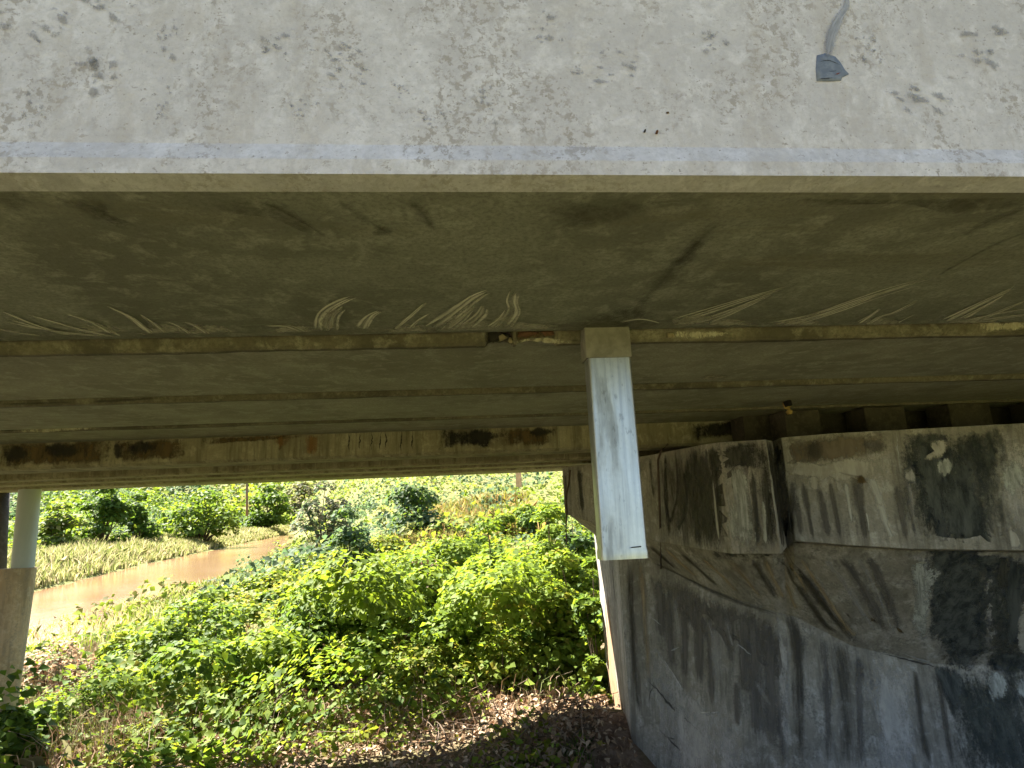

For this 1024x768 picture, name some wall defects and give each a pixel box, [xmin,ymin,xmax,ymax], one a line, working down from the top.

spalling [486,331,569,344]
water stain [650,421,915,549]
water stain [828,559,899,628]
water stain [995,557,1024,647]
water stain [604,548,864,761]
water stain [914,674,930,763]